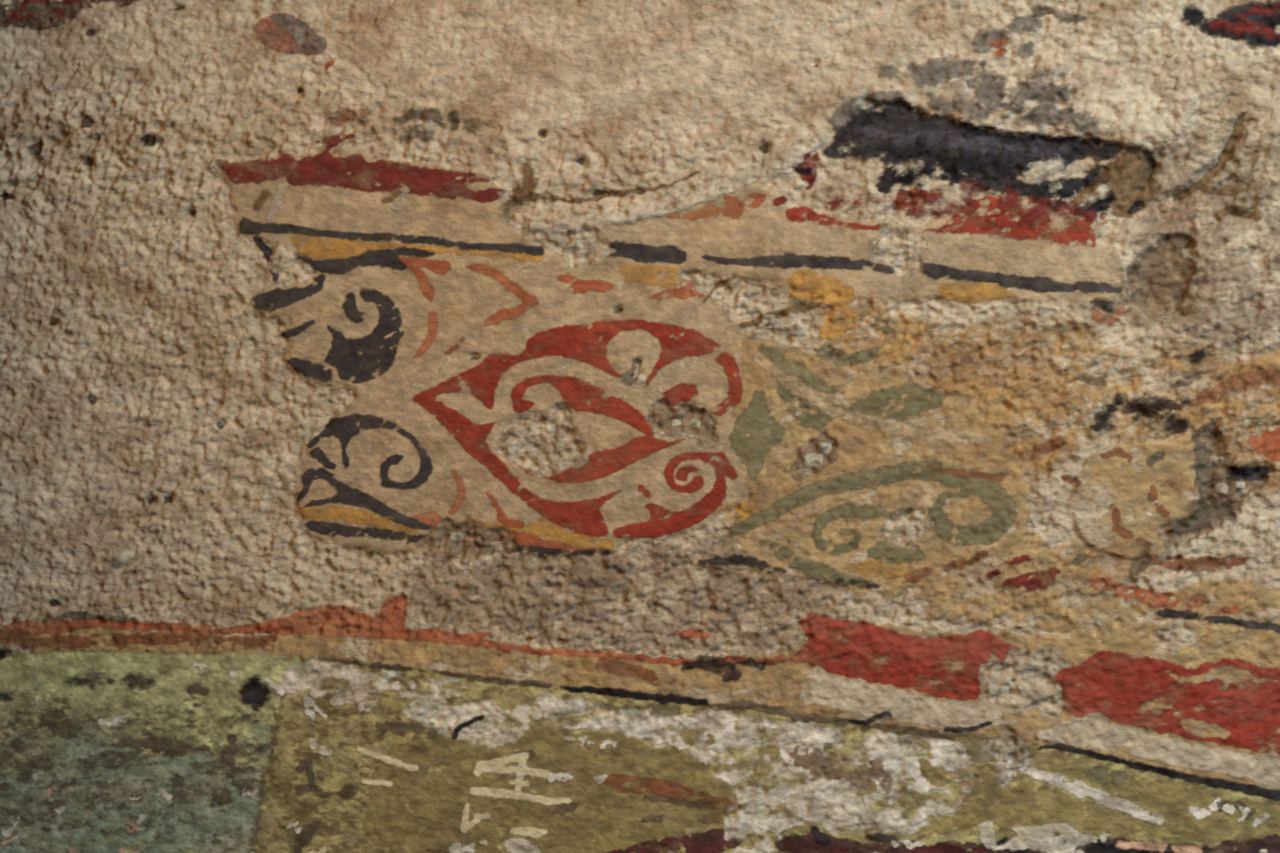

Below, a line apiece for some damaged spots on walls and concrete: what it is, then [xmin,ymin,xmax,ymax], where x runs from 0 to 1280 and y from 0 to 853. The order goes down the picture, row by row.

peeling [854,97,884,112]
peeling [1024,156,1064,192]
peeling [1085,184,1108,202]
flaking render [496,402,594,479]
peeling [265,645,1164,853]
peeling [1189,798,1269,828]
peeling [978,821,1202,853]